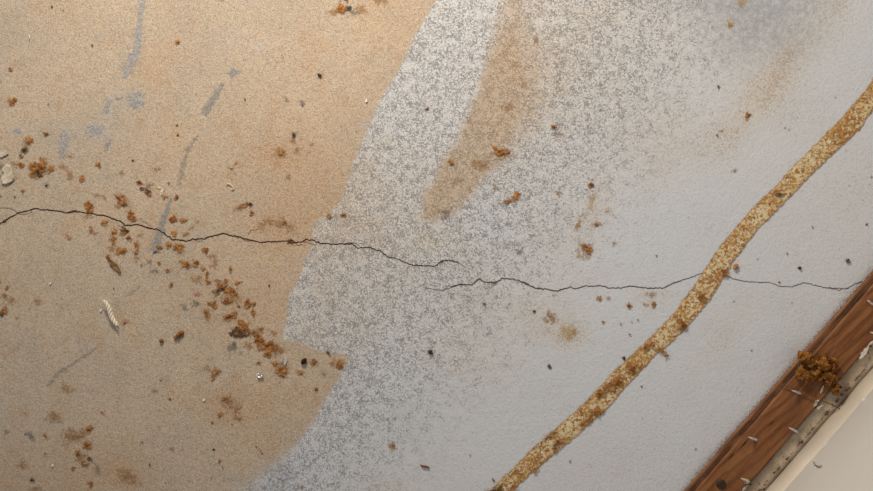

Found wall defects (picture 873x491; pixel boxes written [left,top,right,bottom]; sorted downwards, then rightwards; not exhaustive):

corrosion [491,144,515,158]
peeling [0,145,14,184]
crack [0,207,702,292]
crack [726,276,862,291]
corrosion [639,340,669,358]
corrosion [580,356,640,427]
corrosion [544,430,569,453]